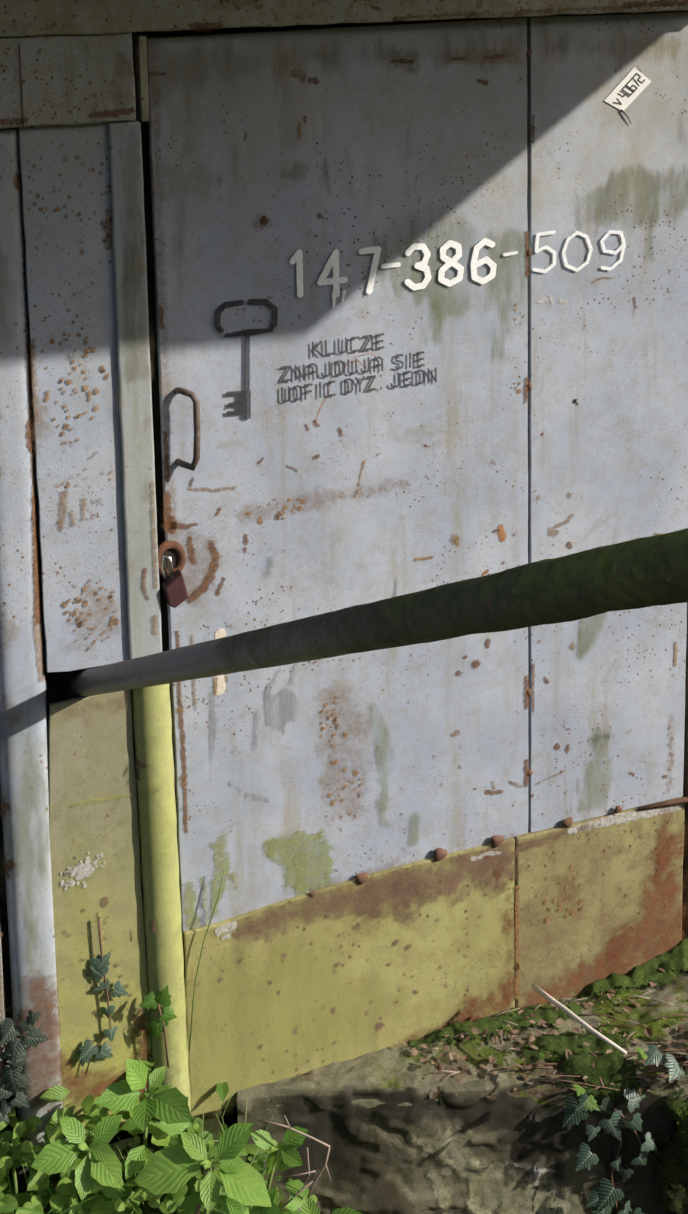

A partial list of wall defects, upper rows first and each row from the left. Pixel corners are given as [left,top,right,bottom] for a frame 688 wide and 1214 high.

rust [14,141,120,681]
rust [142,431,226,603]
rust [456,639,491,676]
rust [320,695,362,819]
peeling [60,851,105,890]
rust [234,819,683,1028]
rust [0,932,126,1109]
damp [287,1078,680,1214]